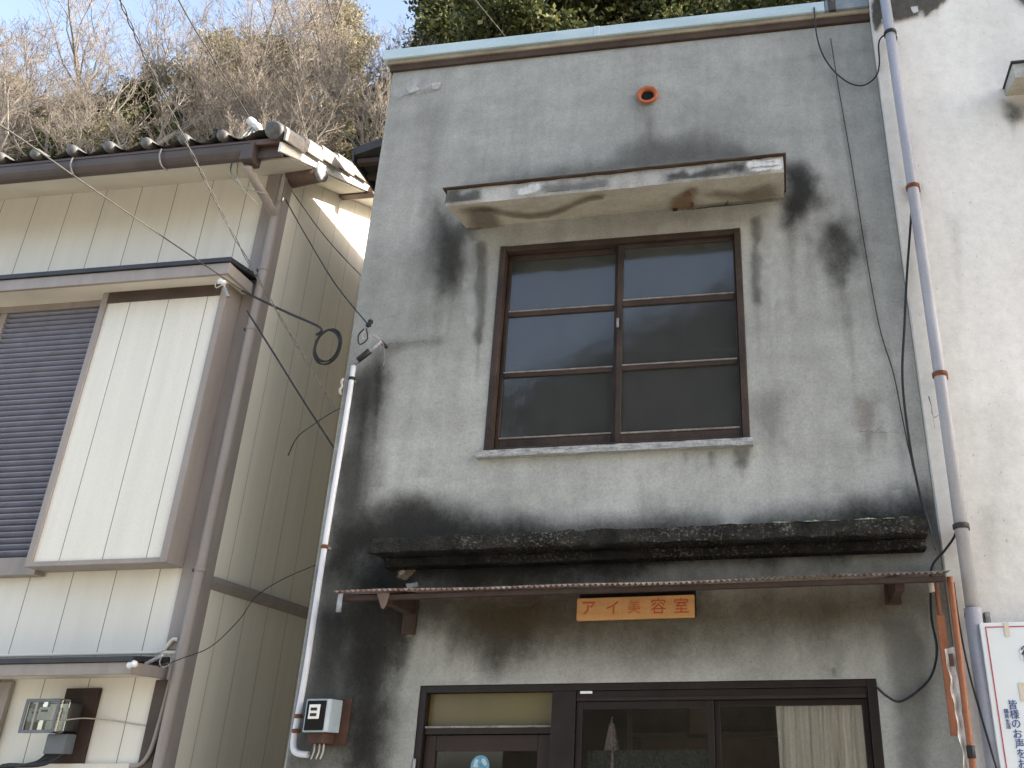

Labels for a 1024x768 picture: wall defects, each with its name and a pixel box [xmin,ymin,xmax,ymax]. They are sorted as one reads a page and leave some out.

rust [670,189,696,211]
damp [785,165,819,224]
damp [433,215,464,283]
damp [827,224,855,267]
damp [474,242,485,342]